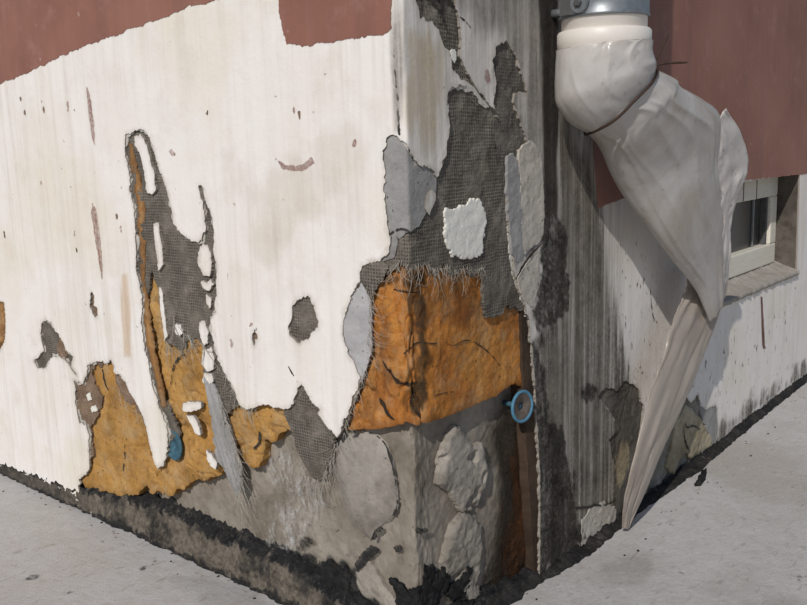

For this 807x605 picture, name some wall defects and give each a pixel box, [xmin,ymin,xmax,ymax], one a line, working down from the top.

spalling [36,0,539,605]
damp [475,0,649,588]
peeling [598,381,643,515]
spalling [645,397,718,494]
damp [282,511,331,570]
damp [338,560,378,605]